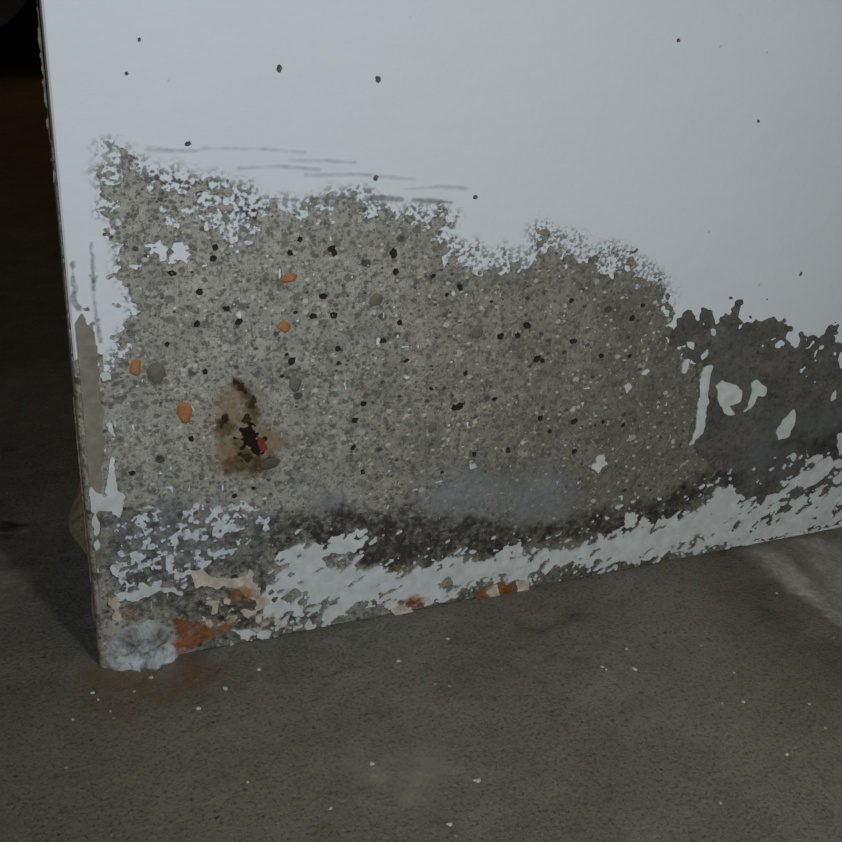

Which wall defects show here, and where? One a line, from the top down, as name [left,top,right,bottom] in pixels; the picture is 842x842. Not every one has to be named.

rust [174,620,230,648]
spalling [51,140,842,668]